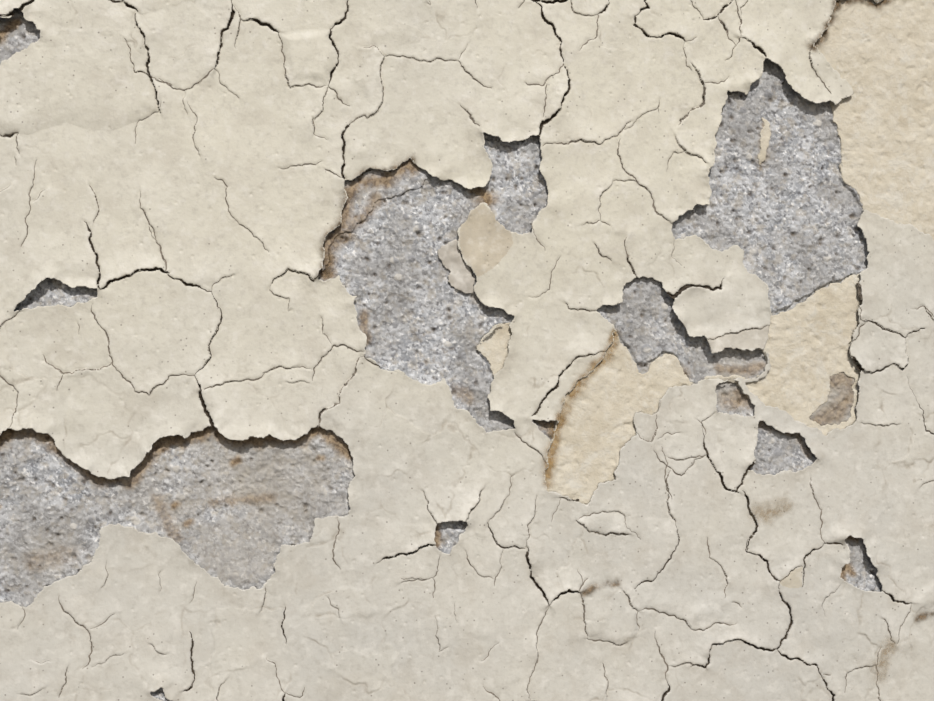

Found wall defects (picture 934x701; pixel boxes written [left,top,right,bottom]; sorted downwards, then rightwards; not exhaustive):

spalling [0,8,40,64]
crack [111,0,491,179]
crack [518,0,673,277]
crack [633,0,767,163]
crack [44,178,388,427]
spalling [0,77,548,607]
crack [667,278,724,299]
spalling [532,0,934,505]
crack [849,281,934,435]
crack [466,475,639,701]
crack [623,403,912,701]
spalling [780,536,882,592]